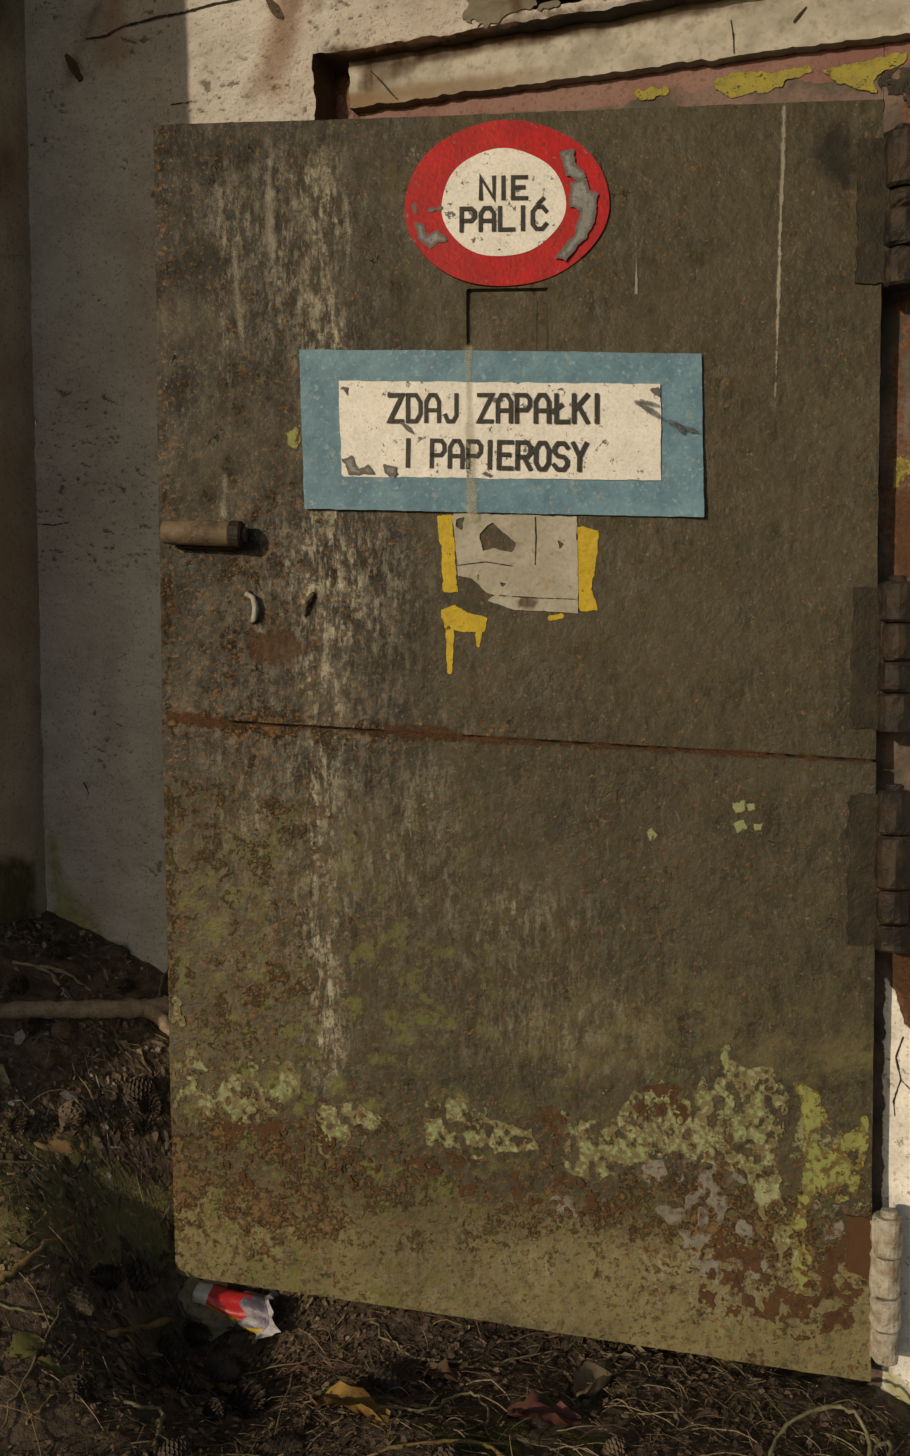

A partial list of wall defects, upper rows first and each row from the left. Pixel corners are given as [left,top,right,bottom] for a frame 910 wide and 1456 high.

crack [86,0,236,40]
peeling [713,52,910,107]
peeling [342,455,397,477]
peeling [893,454,910,488]
rust [349,724,786,758]
peeling [731,800,764,833]
peeling [424,1093,539,1159]
rust [636,1083,690,1126]
rust [220,1116,478,1197]
rust [507,1105,598,1217]
peeling [563,978,910,1396]
rust [698,1226,864,1342]